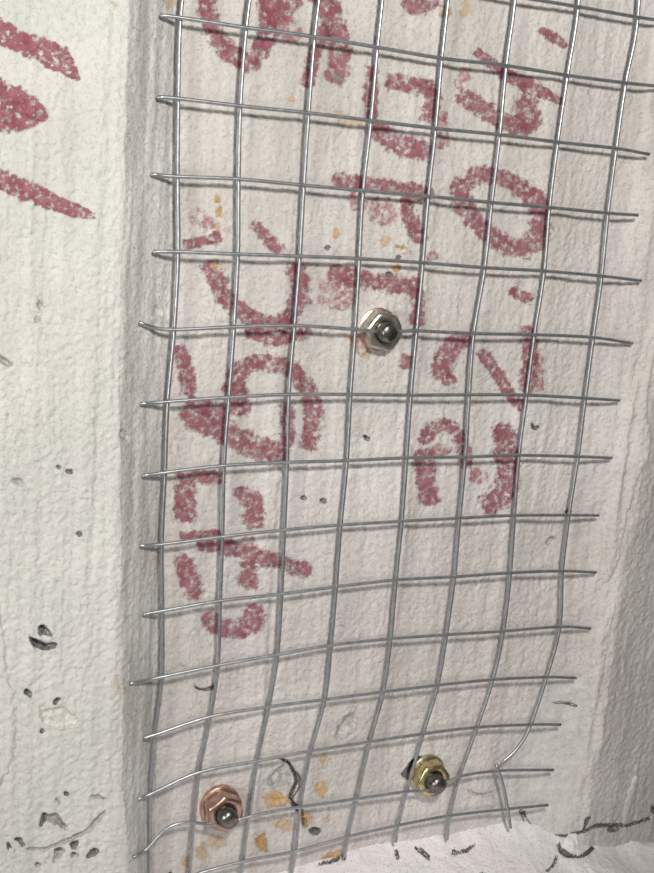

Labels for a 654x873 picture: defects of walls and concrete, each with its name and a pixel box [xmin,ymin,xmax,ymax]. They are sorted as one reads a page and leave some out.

corrosion [263,791,289,808]
corrosion [255,833,268,852]